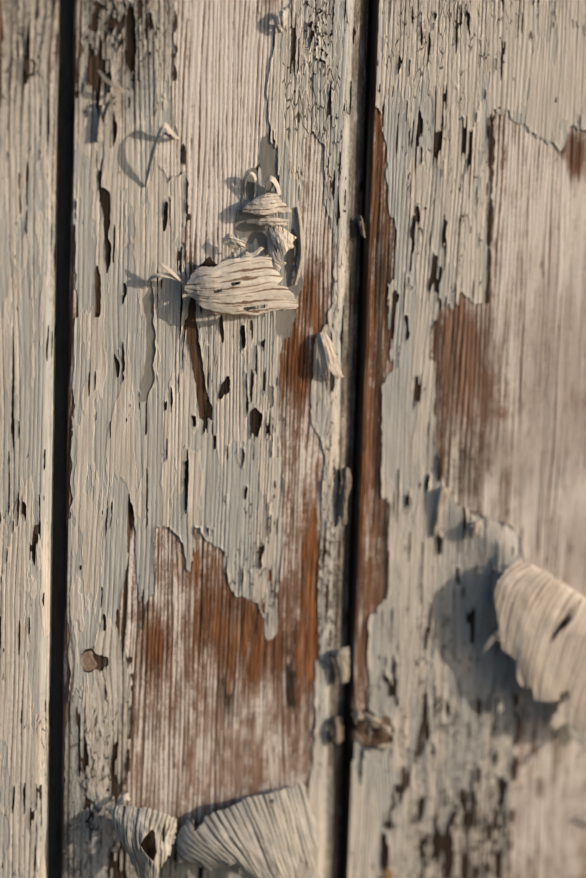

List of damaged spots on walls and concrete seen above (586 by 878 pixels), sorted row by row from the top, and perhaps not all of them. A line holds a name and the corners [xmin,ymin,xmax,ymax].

peeling [0,0,61,878]
peeling [62,0,369,878]
peeling [348,0,586,878]